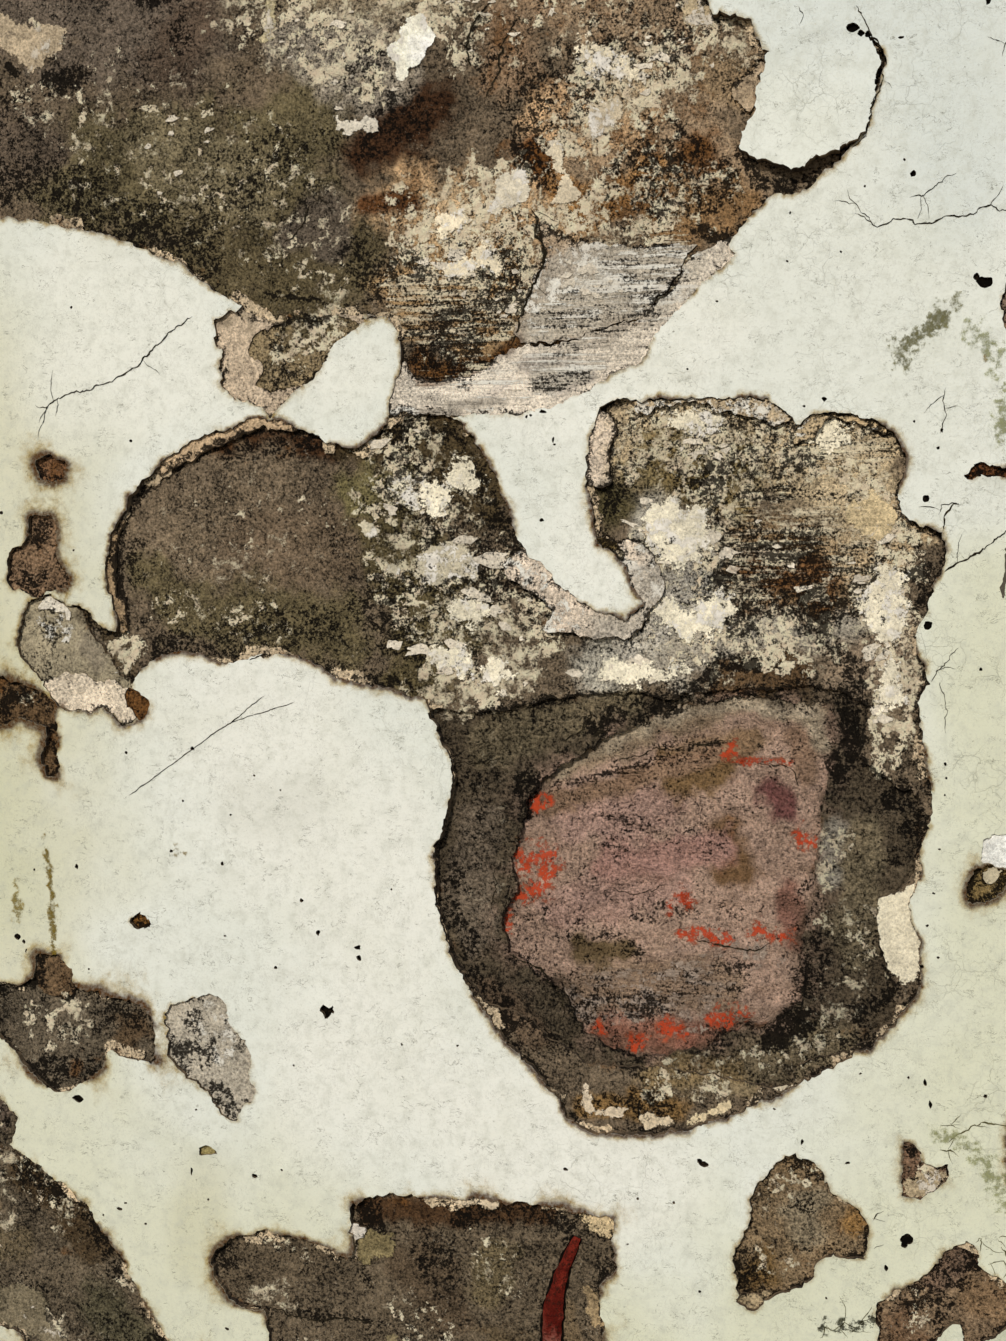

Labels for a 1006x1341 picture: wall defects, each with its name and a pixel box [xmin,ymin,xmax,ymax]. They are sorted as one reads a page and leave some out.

crack [836,173,1006,227]
spalling [973,273,1006,329]
crack [36,317,191,434]
spalling [0,0,948,1134]
crack [920,502,1006,571]
spalling [0,1099,169,1341]
peeling [200,1145,216,1155]
spalling [206,1192,628,1341]
spalling [733,1139,870,1309]
spalling [900,1233,913,1247]
spalling [899,1140,949,1200]
spalling [876,1241,1006,1341]